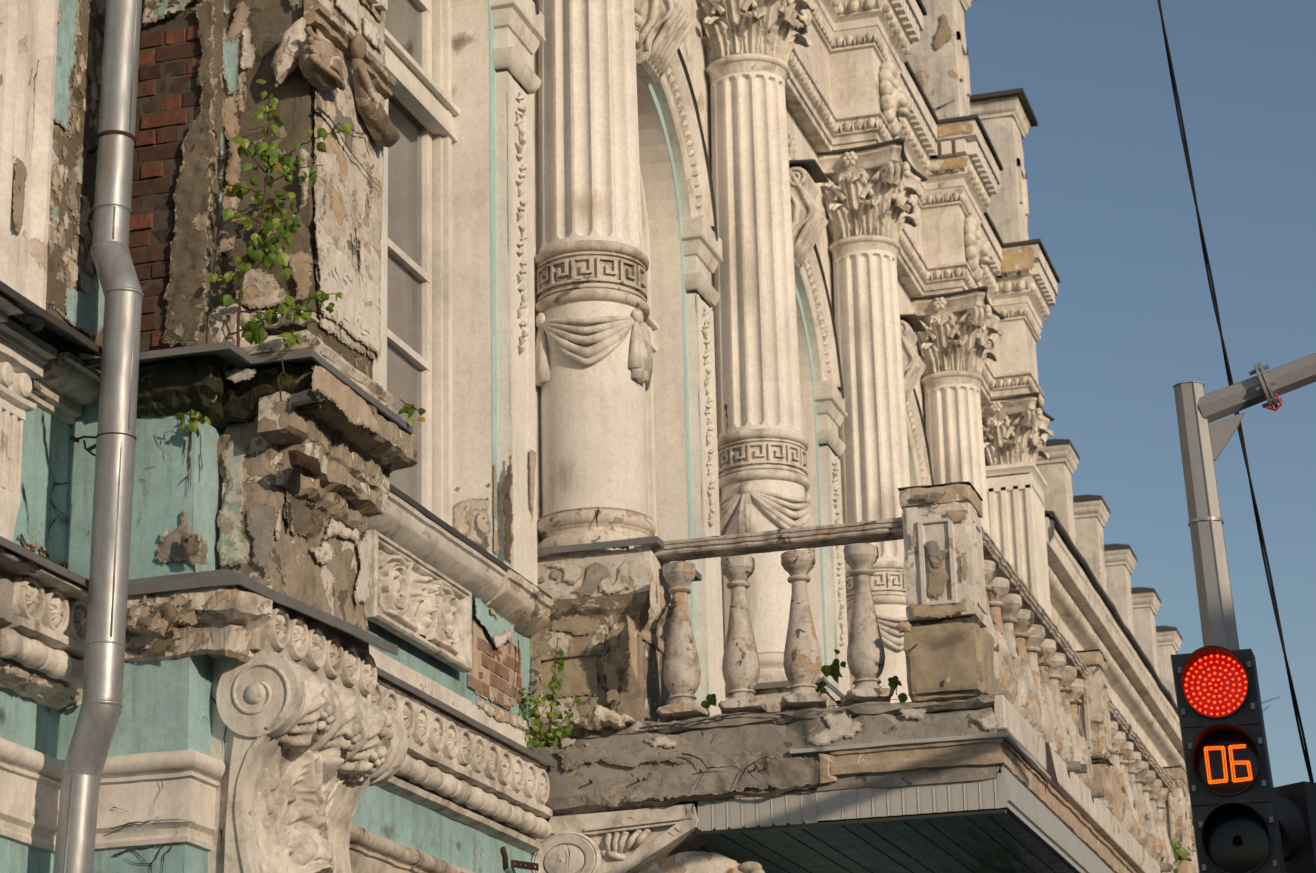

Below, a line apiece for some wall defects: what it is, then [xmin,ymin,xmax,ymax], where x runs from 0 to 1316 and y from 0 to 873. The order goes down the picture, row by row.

flaking render [46,0,106,339]
flaking render [129,0,386,362]
peeling [224,367,256,383]
peeling [312,365,381,434]
crack [23,410,70,538]
peeling [155,440,374,608]
flaking render [126,594,203,653]
flaking render [538,546,633,602]
peeling [648,577,671,623]
flaking render [467,597,529,730]
peeling [899,707,926,719]
peeling [976,711,1000,731]